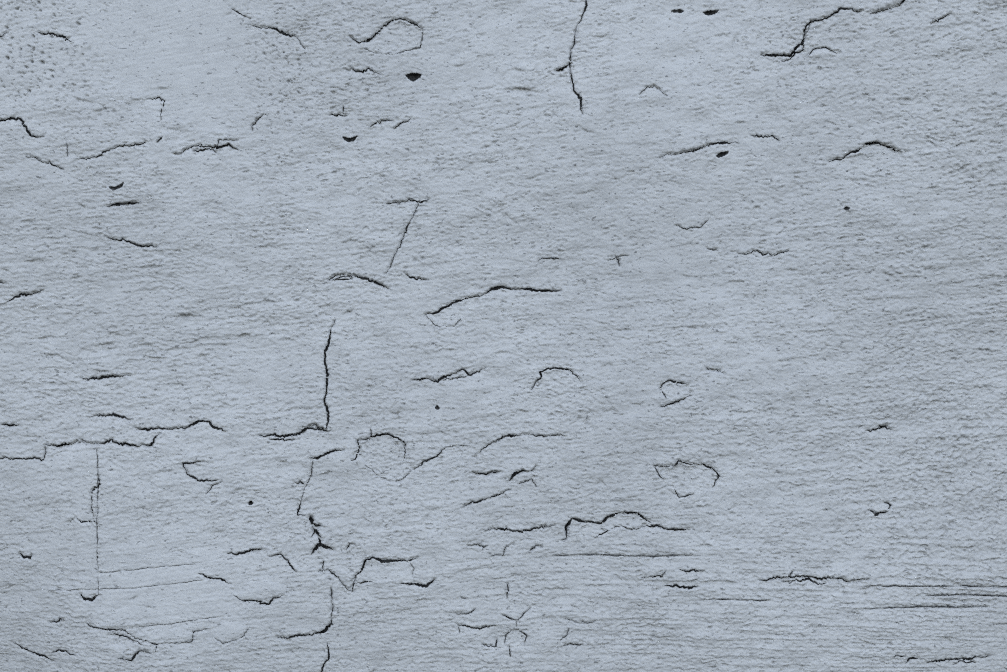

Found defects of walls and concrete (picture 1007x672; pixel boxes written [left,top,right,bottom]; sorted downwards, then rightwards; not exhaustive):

crack [556,0,587,113]
crack [763,0,905,62]
crack [329,199,429,289]
crack [83,373,124,381]
crack [0,413,226,461]
crack [183,461,221,494]
crack [227,321,354,672]